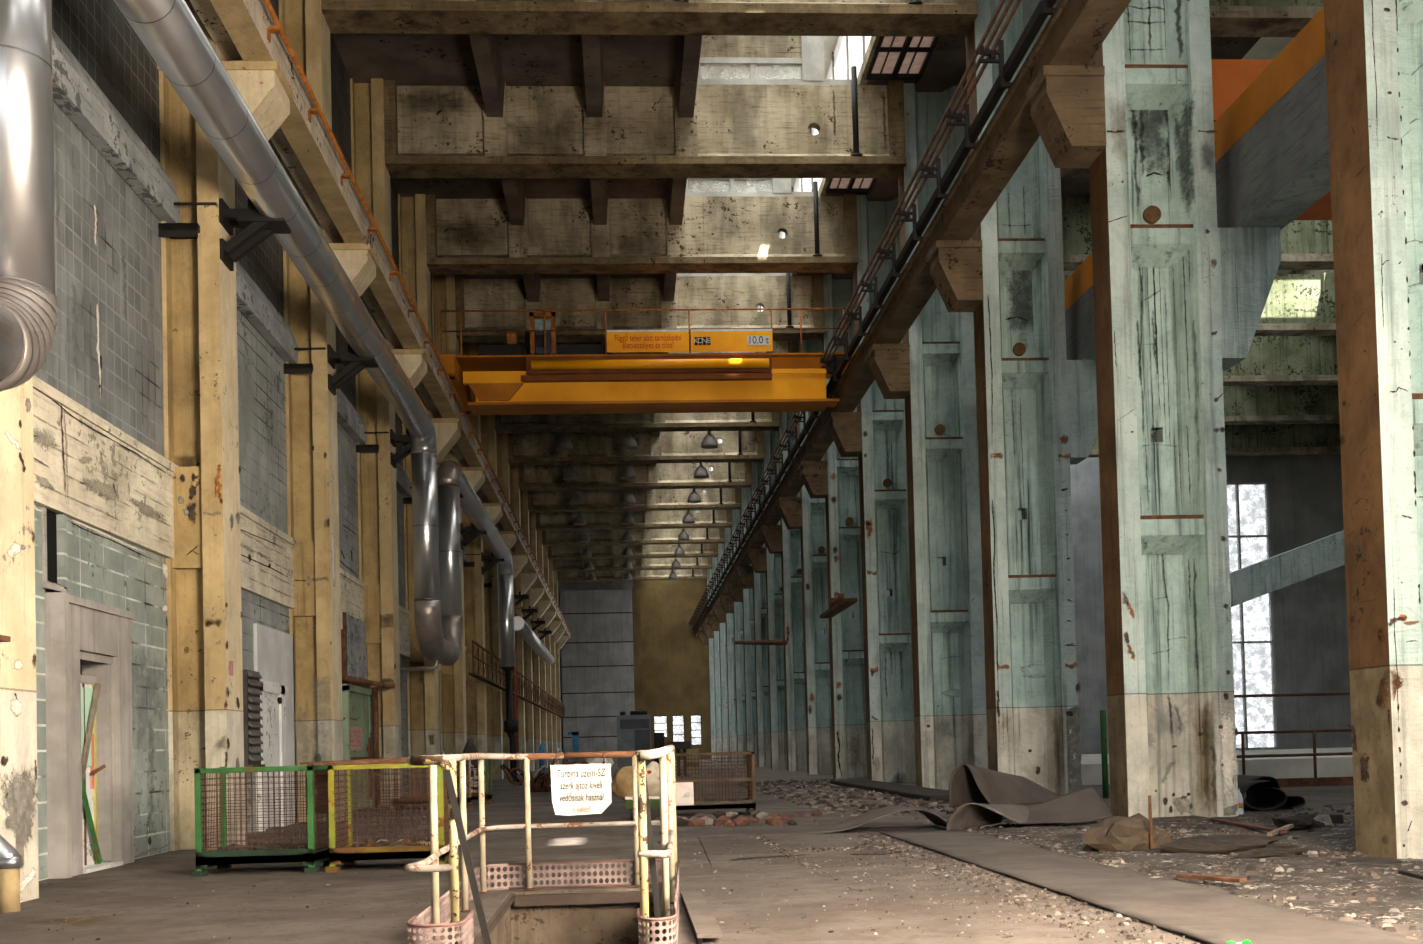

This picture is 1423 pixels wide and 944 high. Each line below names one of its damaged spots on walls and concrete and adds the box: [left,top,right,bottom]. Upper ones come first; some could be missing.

leakage [1107,101,1215,222]
leakage [1006,270,1033,330]
spalling [80,458,167,521]
spalling [178,473,196,524]
corrosion [1122,593,1135,659]
spalling [1,756,38,892]